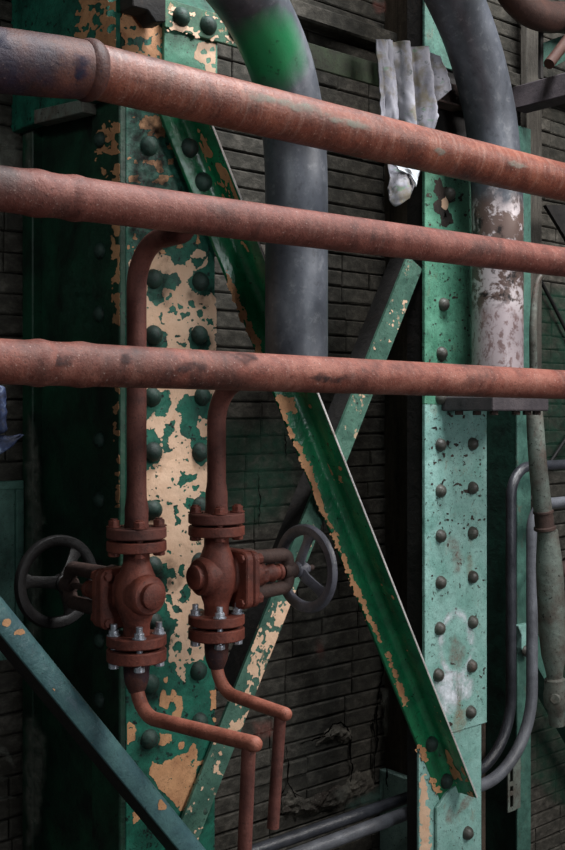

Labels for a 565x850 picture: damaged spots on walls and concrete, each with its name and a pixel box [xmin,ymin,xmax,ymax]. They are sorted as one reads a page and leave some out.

peeling [74,0,234,73]
peeling [147,235,217,351]
peeling [147,388,207,717]
peeling [275,394,382,643]
peeling [127,722,136,745]
peeling [149,733,204,812]
peeling [228,704,249,731]
peeling [245,601,290,695]
peeling [385,651,409,707]
peeling [415,744,428,762]
damp [438,663,471,712]
peeling [419,774,442,850]